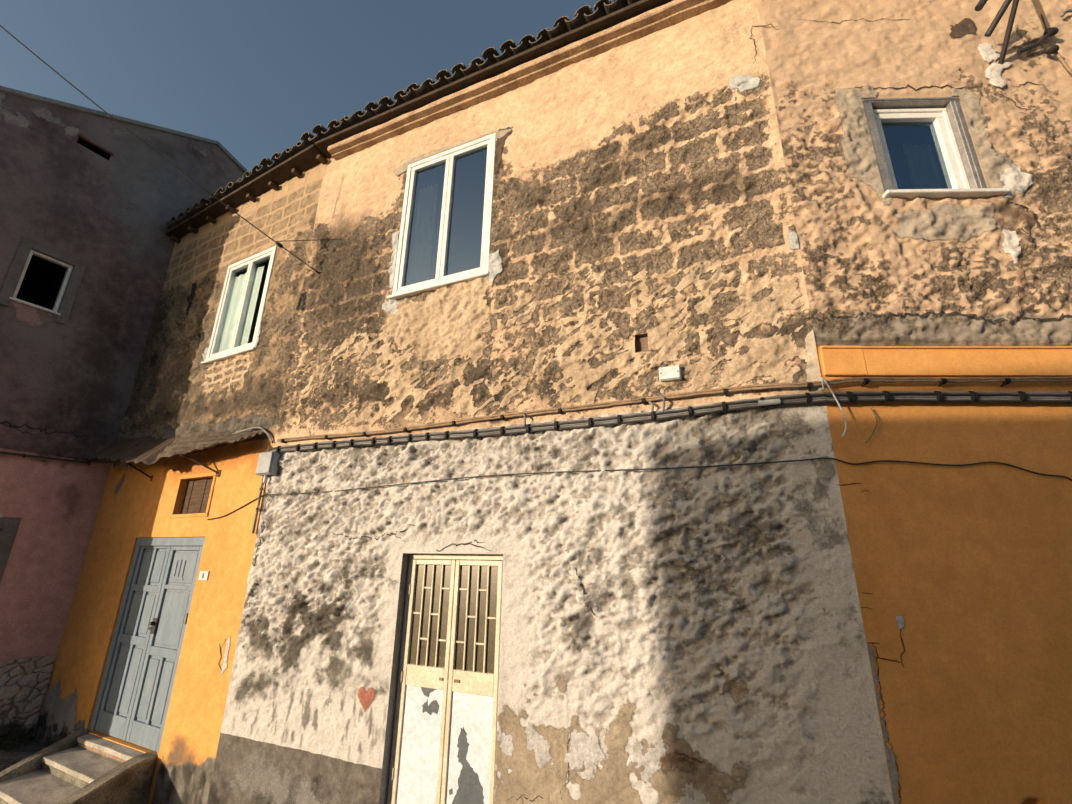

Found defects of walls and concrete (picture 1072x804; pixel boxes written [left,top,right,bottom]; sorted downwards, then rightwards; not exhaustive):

crack [749,18,909,64]
spalling [120,68,1072,436]
crack [0,421,85,437]
peeling [493,432,597,471]
peeling [691,409,814,463]
peeling [791,447,849,548]
crack [436,540,491,552]
peeling [565,488,794,606]
damp [235,566,387,740]
crack [866,642,901,663]
peeling [494,684,748,804]
damp [231,752,320,804]